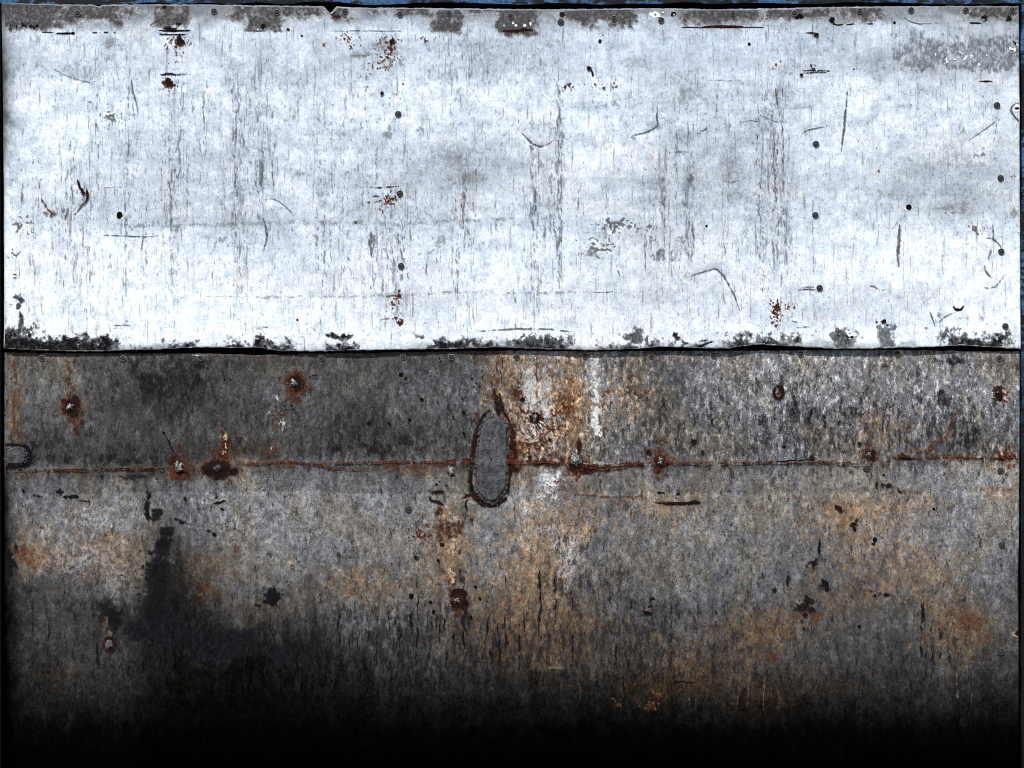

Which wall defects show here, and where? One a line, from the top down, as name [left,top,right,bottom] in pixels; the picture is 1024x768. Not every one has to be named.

peeling [221,6,887,48]
corrosion [322,31,404,99]
peeling [4,293,205,350]
peeling [313,329,372,350]
peeling [415,325,575,360]
peeling [590,326,863,349]
peeling [925,316,1016,347]
corrosion [52,362,89,438]
corrosion [281,355,314,406]
corrosion [770,384,785,409]
corrosion [991,385,1010,406]
corrosion [407,352,642,632]